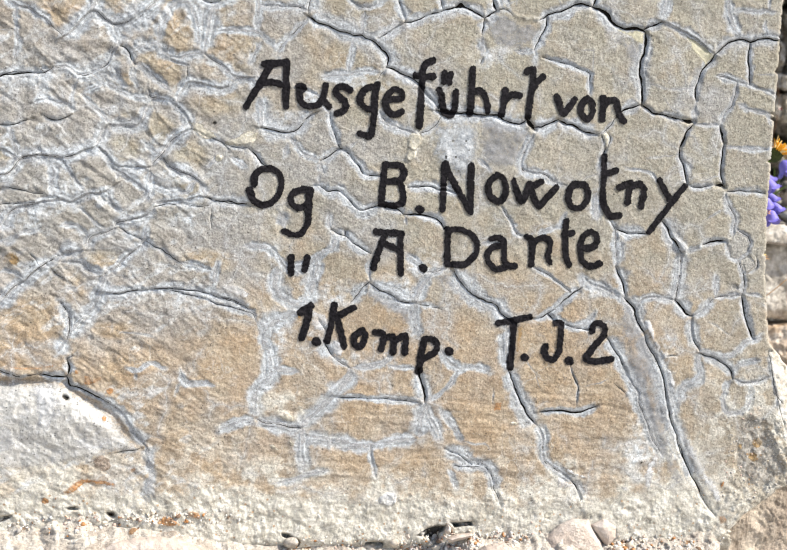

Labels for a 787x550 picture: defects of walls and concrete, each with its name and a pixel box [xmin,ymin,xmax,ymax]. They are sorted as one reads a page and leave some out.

crack [0,0,509,373]
crack [381,0,786,508]
crack [0,301,117,409]
crack [117,435,154,498]
crack [218,321,499,499]